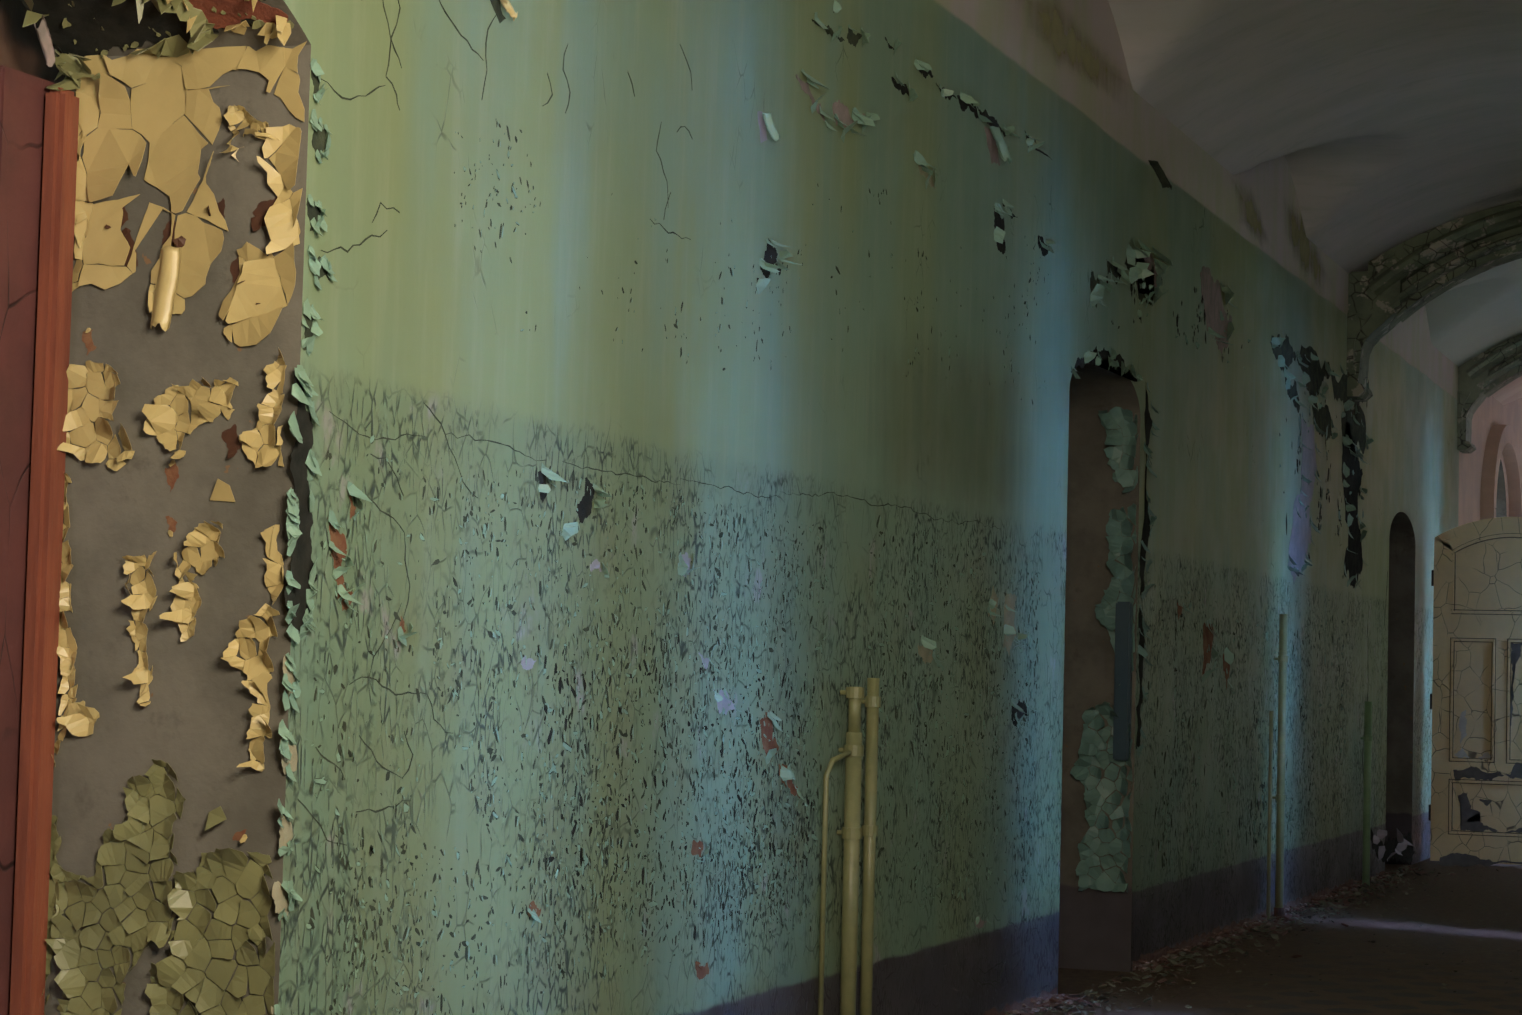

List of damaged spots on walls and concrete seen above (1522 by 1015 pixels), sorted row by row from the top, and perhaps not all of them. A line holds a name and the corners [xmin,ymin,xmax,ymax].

crack [321,0,402,111]
crack [439,0,496,100]
crack [543,44,571,114]
peeling [891,57,1052,166]
crack [321,202,400,253]
crack [650,122,693,240]
peeling [994,199,1018,259]
peeling [1090,238,1251,369]
peeling [21,0,382,797]
peeling [1270,334,1374,590]
peeling [320,463,828,1015]
peeling [1453,748,1522,833]